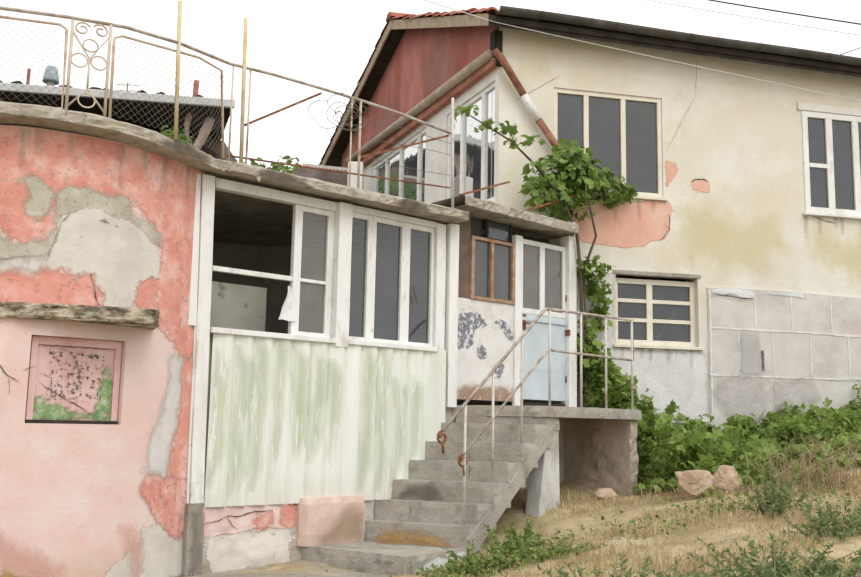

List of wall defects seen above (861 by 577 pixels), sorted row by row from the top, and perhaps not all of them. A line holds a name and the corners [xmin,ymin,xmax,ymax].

peeling [664,161,678,186]
flaking render [690,180,710,193]
peeling [570,199,675,248]
crack [44,344,115,352]
peeling [0,126,204,577]
peeling [458,308,513,378]
crack [0,365,90,414]
flaking render [203,501,297,573]